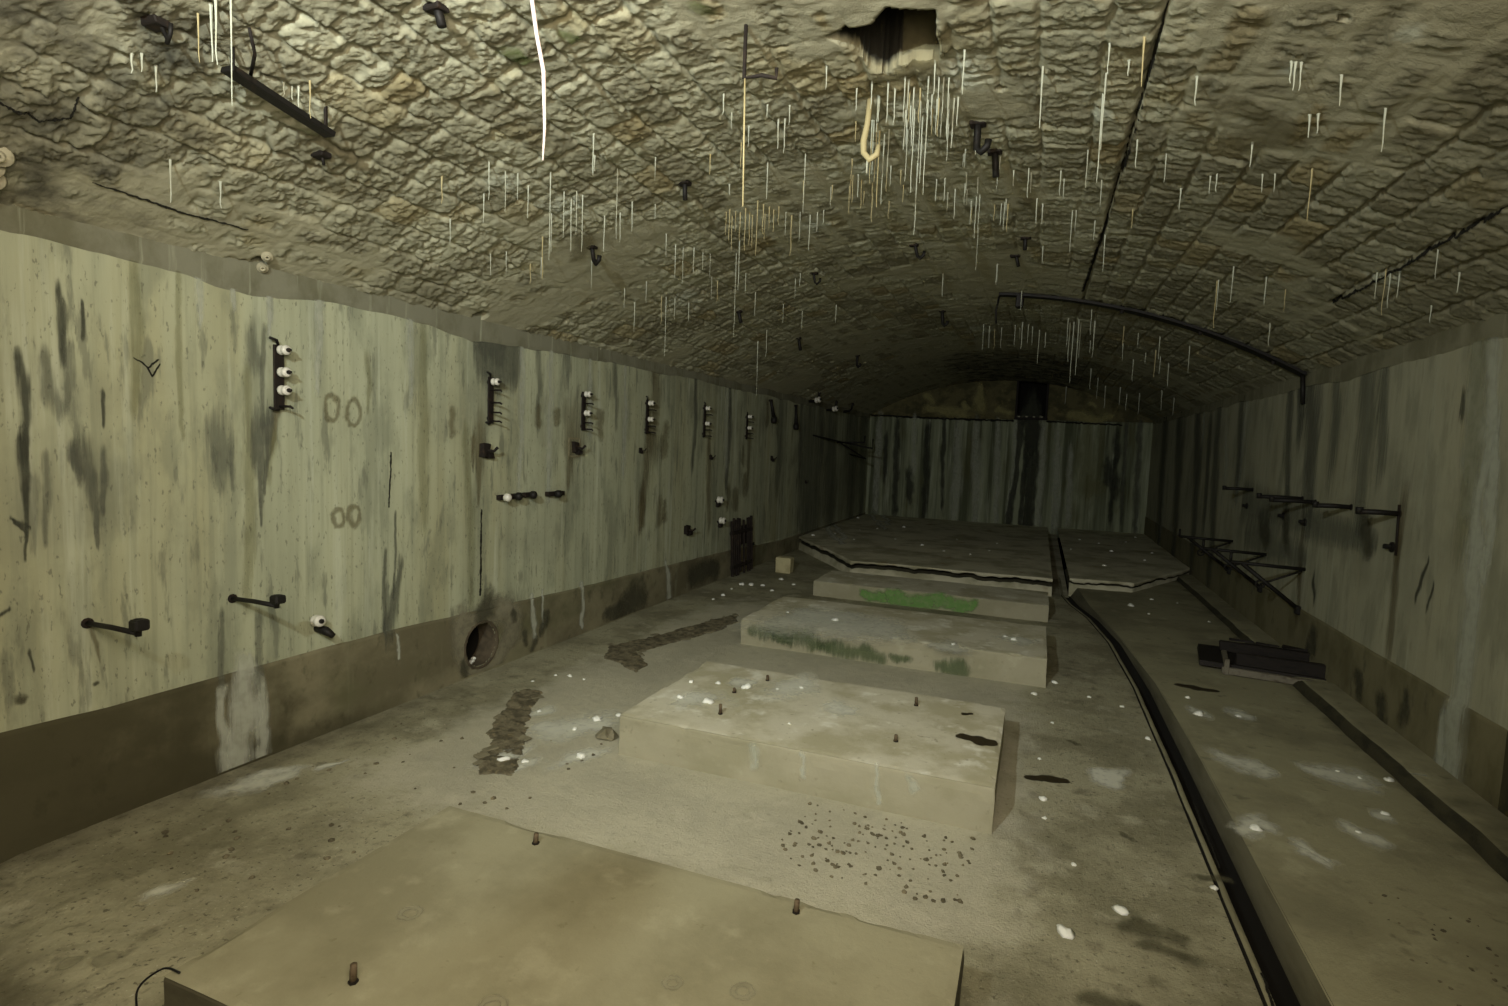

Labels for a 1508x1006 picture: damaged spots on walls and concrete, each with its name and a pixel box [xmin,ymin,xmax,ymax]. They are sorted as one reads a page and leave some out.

damp [56,284,85,365]
damp [474,341,521,393]
damp [14,350,30,561]
damp [70,441,107,547]
damp [251,413,273,526]
damp [868,418,946,529]
damp [1005,393,1041,526]
damp [1436,340,1500,778]